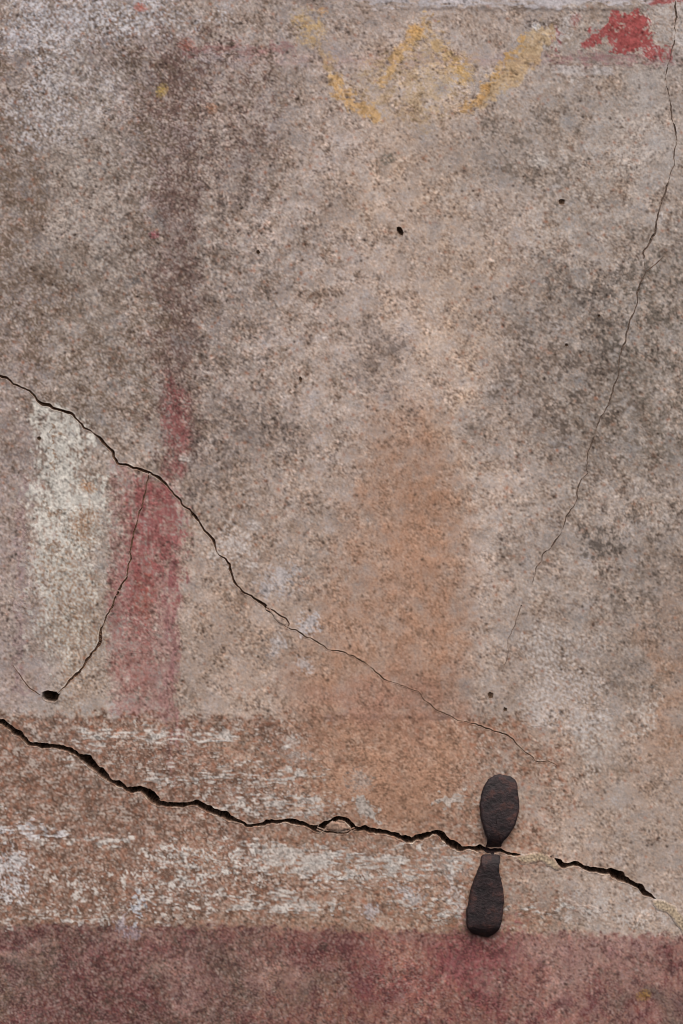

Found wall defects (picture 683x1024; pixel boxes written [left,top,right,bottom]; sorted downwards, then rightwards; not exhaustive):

crack [501,0,679,671]
crack [0,373,558,767]
crack [0,718,683,934]